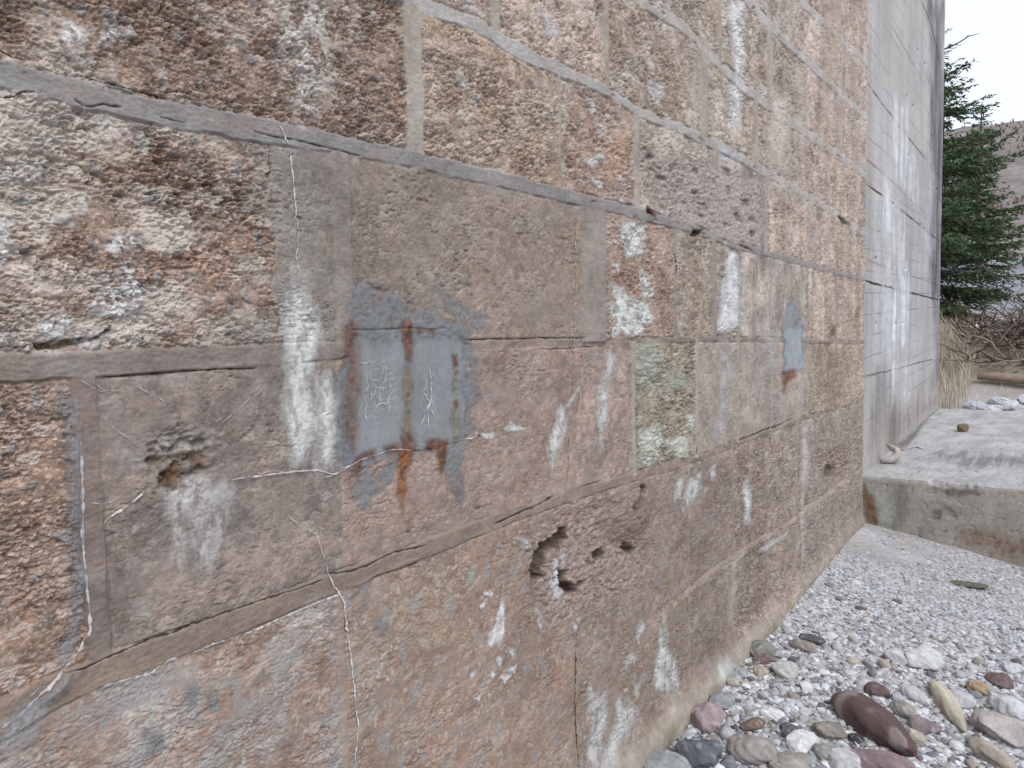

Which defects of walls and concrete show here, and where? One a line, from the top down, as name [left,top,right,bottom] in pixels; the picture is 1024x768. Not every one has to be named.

crack [259,124,359,270]
efflorescence [612,222,646,271]
efflorescence [608,272,654,336]
efflorescence [717,251,740,331]
spalling [145,438,203,484]
efflorescence [280,287,336,464]
crack [233,361,437,480]
corrosion [387,321,433,495]
corrosion [428,439,447,471]
efflorescence [168,476,232,565]
crack [1,442,421,762]
spalling [524,506,641,621]